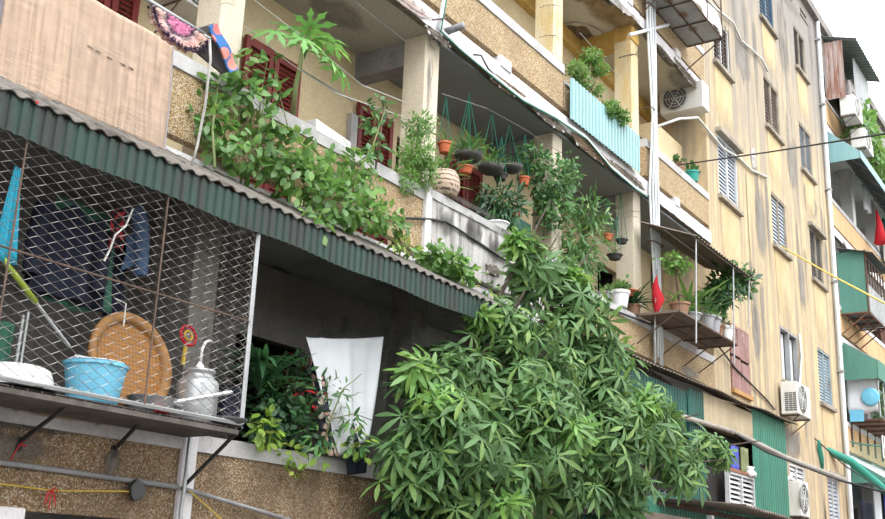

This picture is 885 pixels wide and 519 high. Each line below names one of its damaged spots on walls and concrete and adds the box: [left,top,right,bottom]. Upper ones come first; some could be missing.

leakage [577,0,638,28]